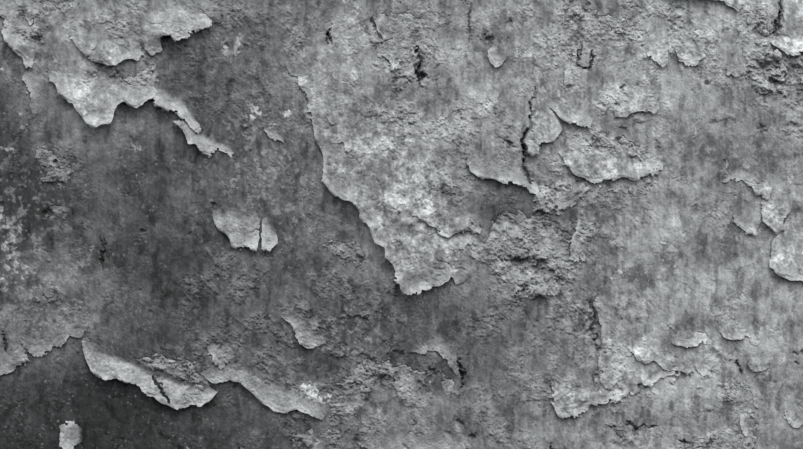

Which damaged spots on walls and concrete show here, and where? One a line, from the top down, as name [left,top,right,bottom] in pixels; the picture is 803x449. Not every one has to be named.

flaking render [0,0,234,158]
flaking render [720,0,803,100]
flaking render [285,12,666,305]
crack [519,88,538,184]
flaking render [211,206,278,252]
flaking render [722,168,803,281]
flaking render [0,311,477,449]
flaking render [550,297,714,419]
flaking render [717,313,751,340]